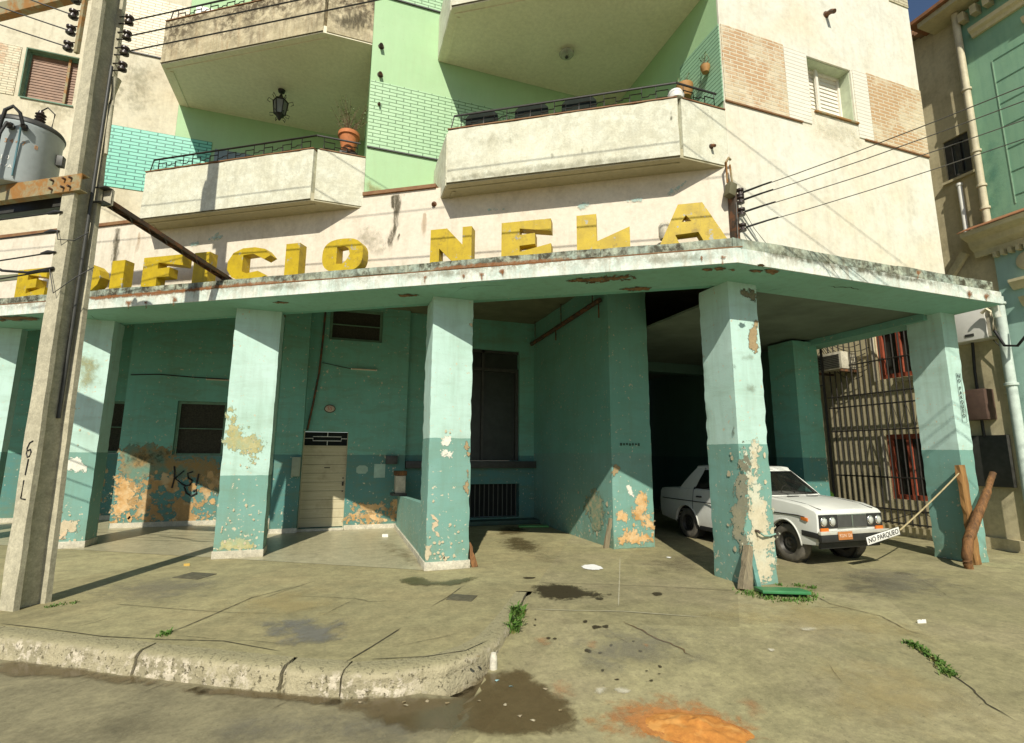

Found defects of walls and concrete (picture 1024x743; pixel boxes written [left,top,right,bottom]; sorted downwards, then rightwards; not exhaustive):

leakage [388,195,401,244]
spalling [747,320,759,353]
peeling [221,405,267,468]
peeling [440,430,470,494]
peeling [59,514,80,542]
peeling [100,440,259,551]
peeling [341,499,397,525]
peeling [424,515,463,561]
peeling [606,485,655,546]
peeling [727,437,787,584]
crack [946,667,1013,719]